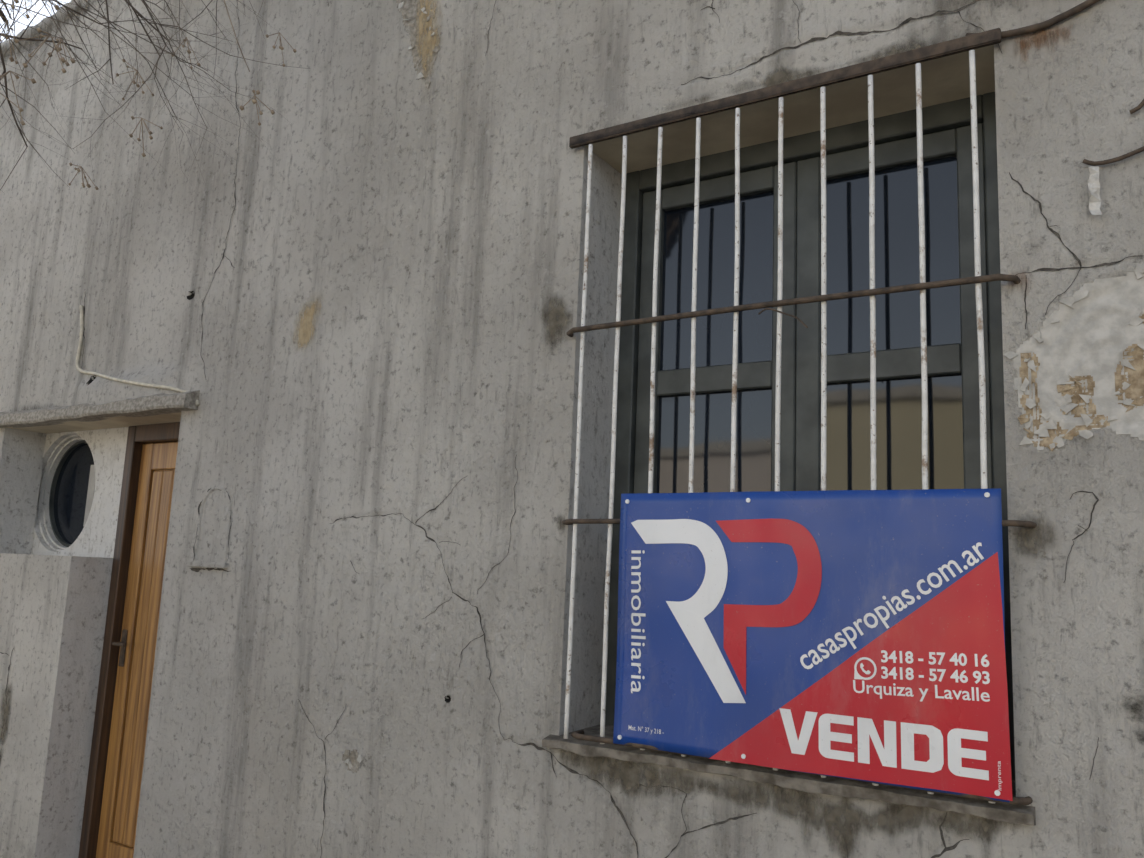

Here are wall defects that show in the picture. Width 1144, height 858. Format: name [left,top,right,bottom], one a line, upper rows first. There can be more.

spalling [396,0,440,88]
crack [681,0,1002,85]
crack [1009,172,1133,329]
flaking render [1003,262,1144,451]
crack [1064,491,1099,582]
crack [329,455,638,858]
crack [299,700,346,858]
crack [641,784,756,858]
crack [931,812,969,858]